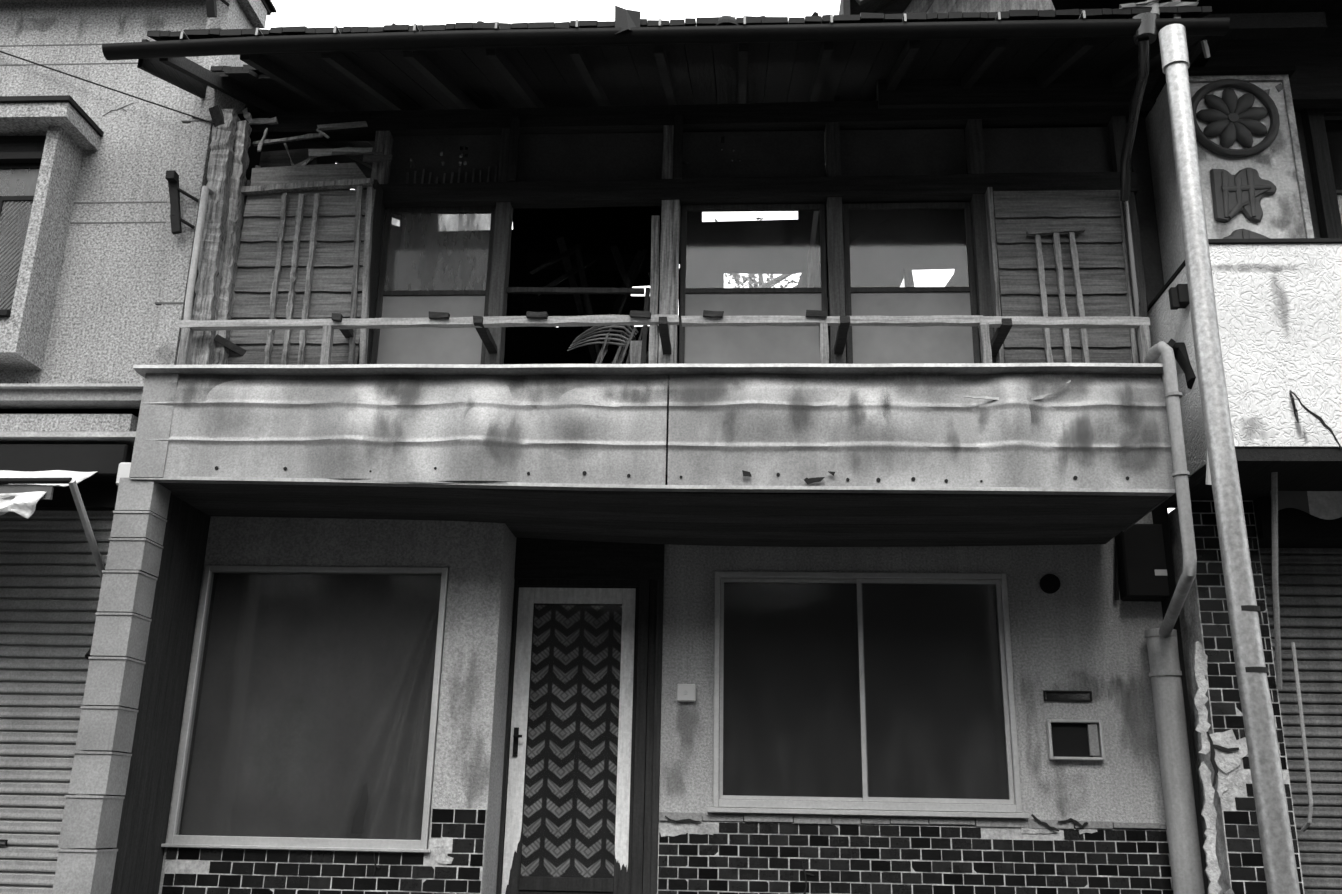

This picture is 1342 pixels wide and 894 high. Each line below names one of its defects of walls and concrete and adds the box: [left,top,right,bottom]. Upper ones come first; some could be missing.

crack [1289,391,1342,449]
spalling [1193,641,1248,894]